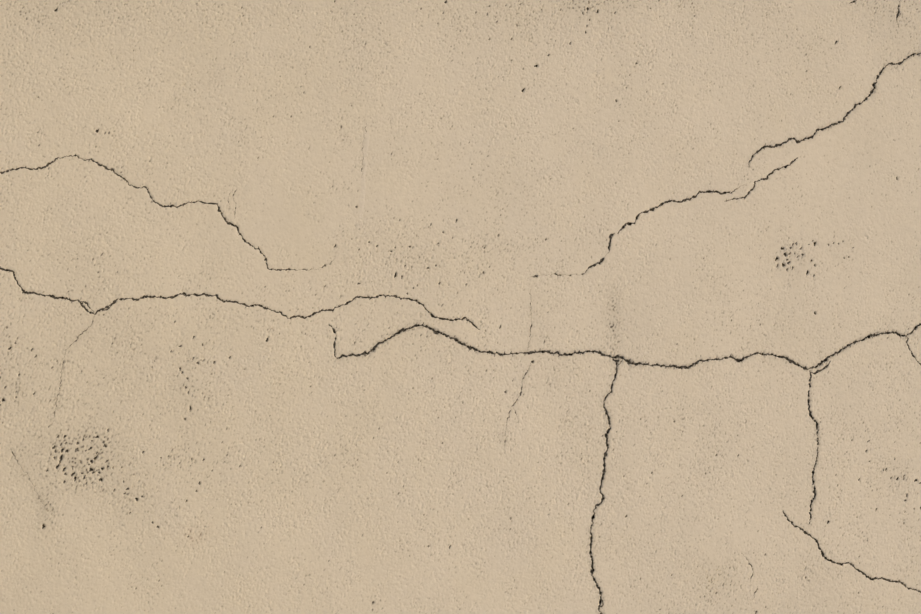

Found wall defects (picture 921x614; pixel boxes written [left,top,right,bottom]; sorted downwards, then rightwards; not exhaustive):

crack [0,154,332,271]
crack [529,53,921,278]
crack [0,268,921,614]